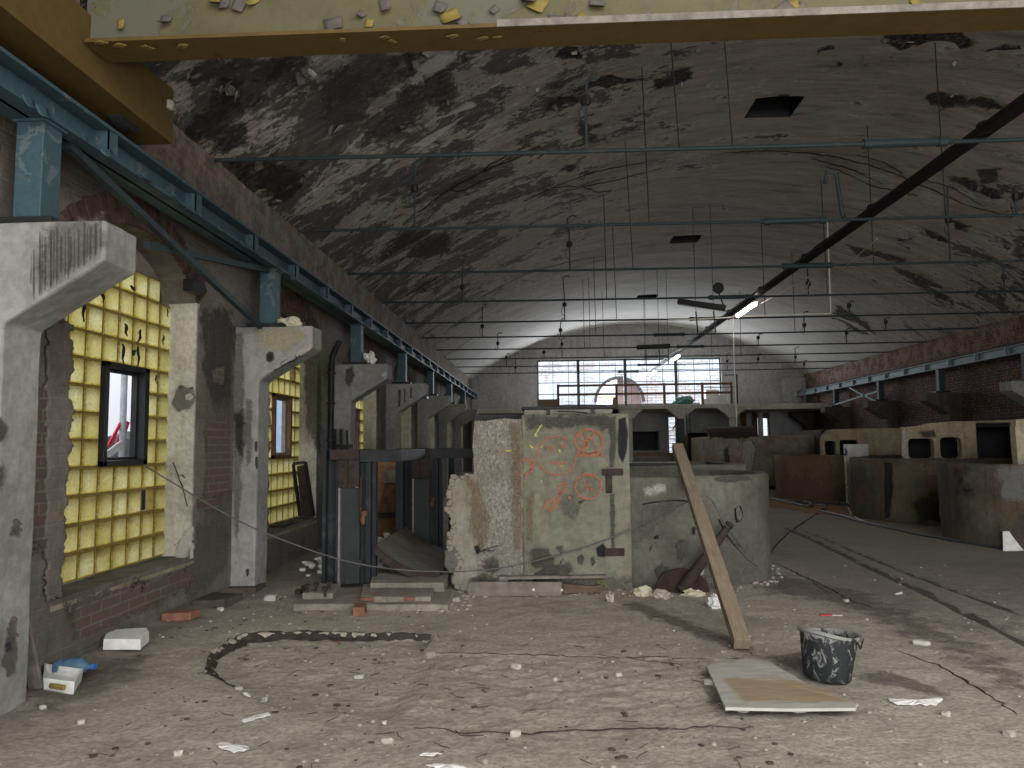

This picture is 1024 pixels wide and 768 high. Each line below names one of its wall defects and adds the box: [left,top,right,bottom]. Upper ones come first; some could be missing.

crack [419,146,541,213]
crack [523,159,663,202]
crack [704,150,1012,218]
spalling [10,321,75,601]
spalling [445,547,462,571]
crack [776,563,871,608]
crack [897,650,1017,714]